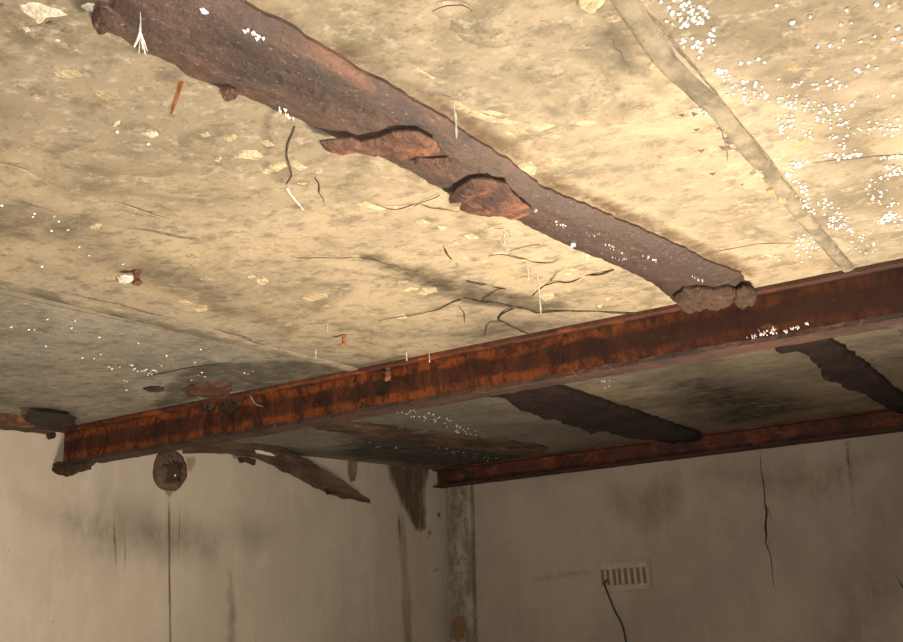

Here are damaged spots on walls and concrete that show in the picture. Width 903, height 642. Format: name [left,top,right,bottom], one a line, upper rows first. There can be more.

corrosion [92,7,114,35]
corrosion [219,87,240,102]
corrosion [319,130,452,169]
corrosion [448,178,534,220]
corrosion [52,461,92,477]
corrosion [237,457,256,465]
corrosion [348,461,358,482]
crack [760,458,776,590]